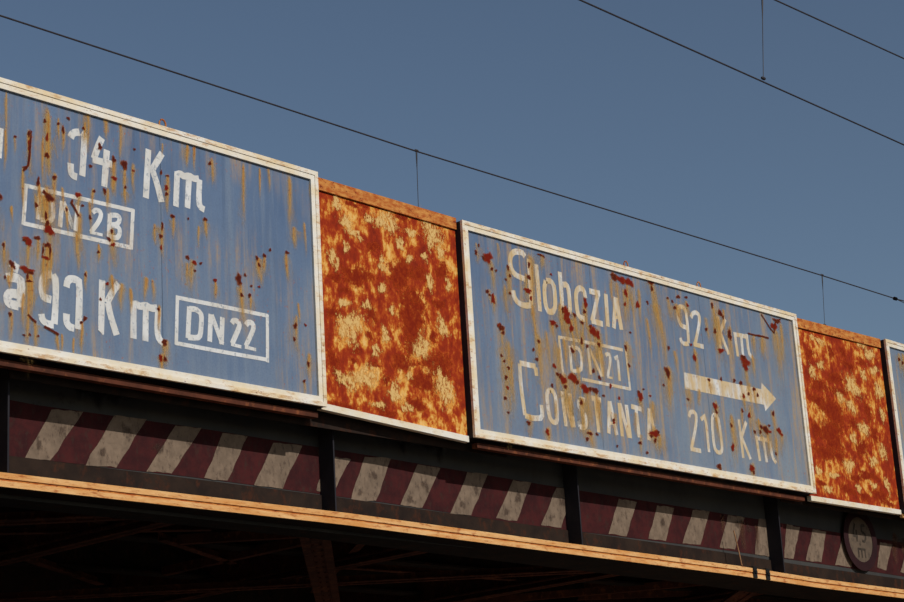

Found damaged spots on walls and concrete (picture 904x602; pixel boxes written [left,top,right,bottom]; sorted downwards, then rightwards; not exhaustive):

rust [2,94,135,353]
rust [159,339,168,368]
rust [235,248,272,311]
rust [351,257,452,415]
rust [475,244,511,305]
rust [524,253,612,443]
rust [610,272,677,394]
rust [705,303,732,353]
rust [327,401,361,410]
rust [730,355,783,455]
rust [808,345,878,463]
rust [841,469,894,508]